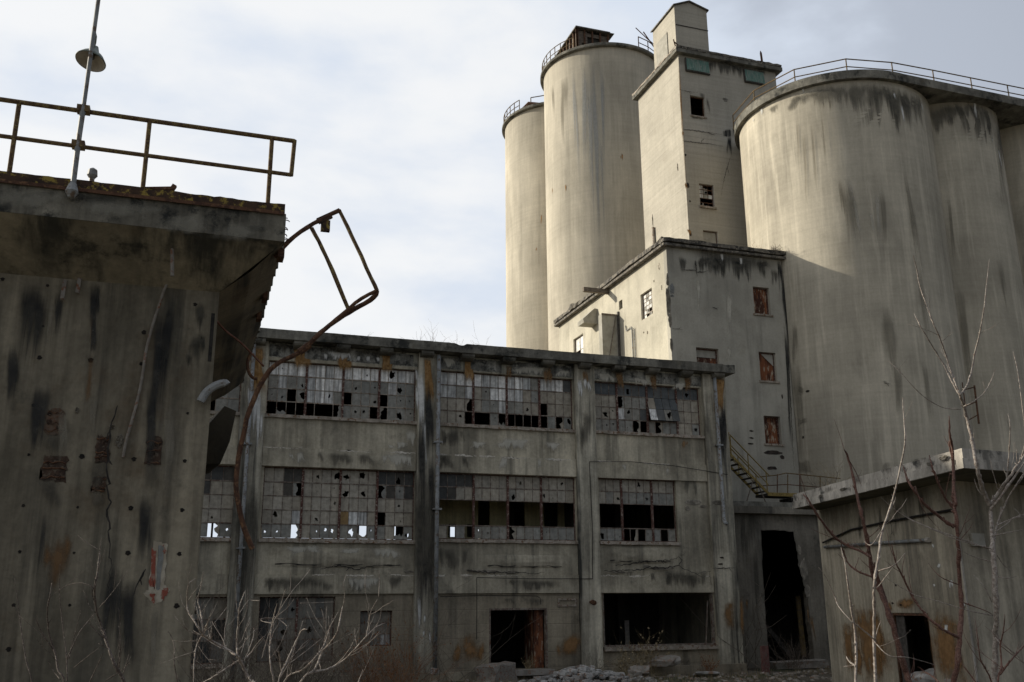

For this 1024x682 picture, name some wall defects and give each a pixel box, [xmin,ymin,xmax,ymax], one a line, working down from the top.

damp [789,88,1004,165]
damp [8,293,62,396]
damp [699,251,791,430]
damp [147,310,174,475]
corrosion [39,408,69,501]
corrosion [90,434,111,503]
crack [105,405,146,601]
damp [139,503,150,550]
damp [383,370,467,641]
crack [604,556,732,576]
damp [103,577,134,655]
corrosion [844,611,891,681]